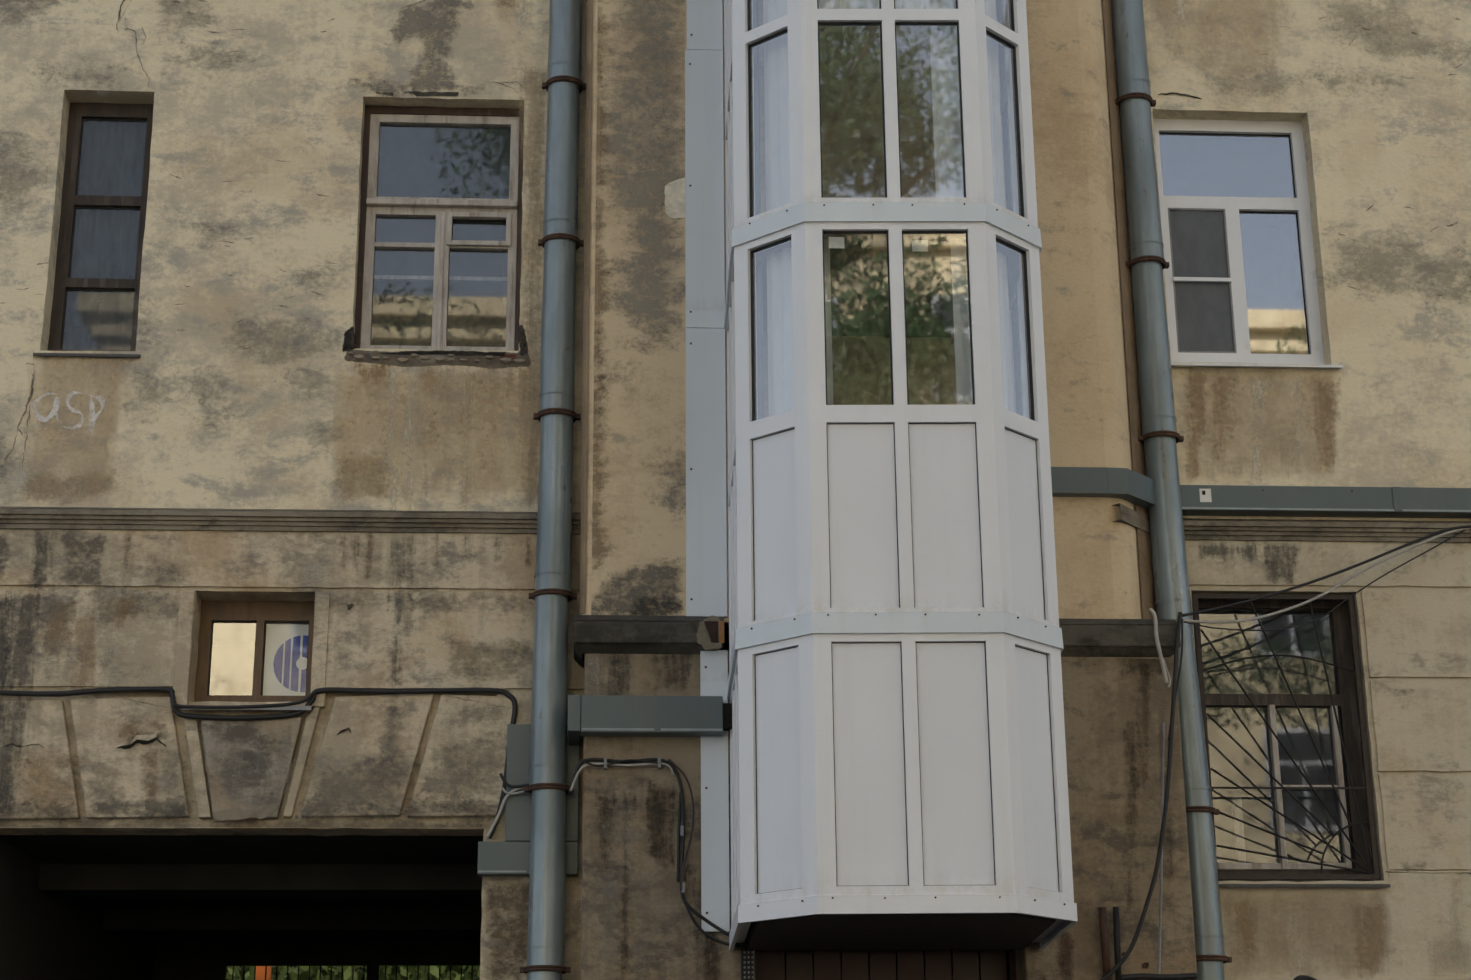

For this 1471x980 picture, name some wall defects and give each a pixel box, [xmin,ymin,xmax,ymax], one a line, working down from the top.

crack [116,0,149,87]
damp [592,0,686,568]
damp [591,562,681,615]
damp [0,534,68,809]
spalling [117,732,167,749]